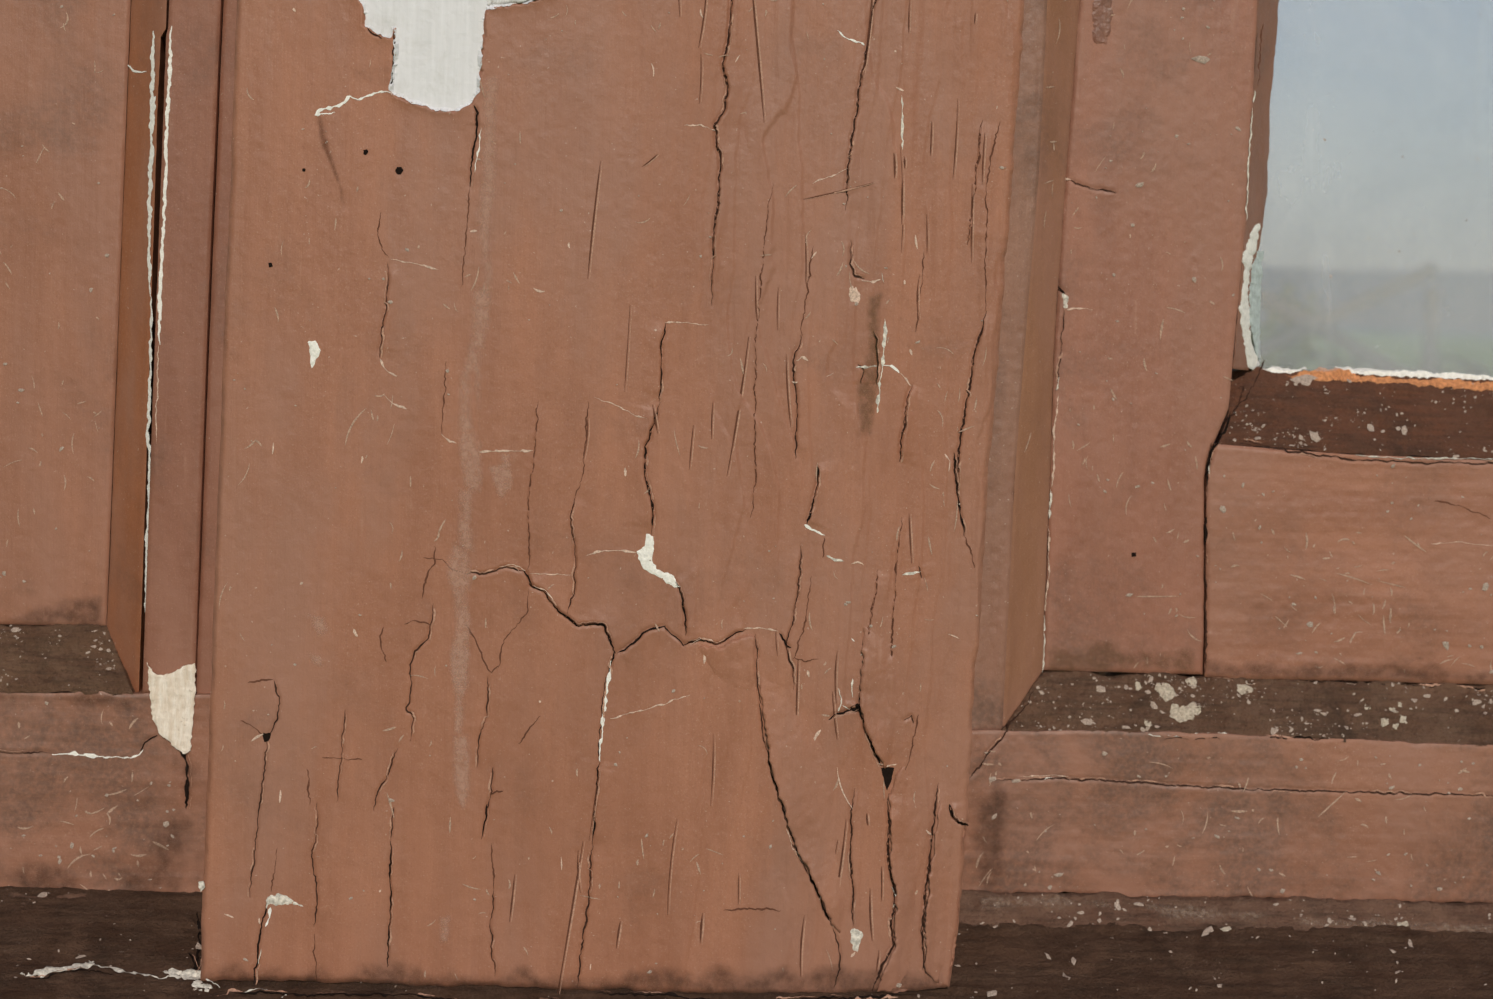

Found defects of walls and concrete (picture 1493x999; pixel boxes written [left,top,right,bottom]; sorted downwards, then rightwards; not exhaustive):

peeling [147,663,196,754]
peeling [315,0,534,124]
crack [189,0,969,999]
peeling [637,534,679,587]
crack [945,120,1000,568]
crack [971,286,1493,798]
peeling [1239,23,1306,374]
peeling [1335,366,1493,380]